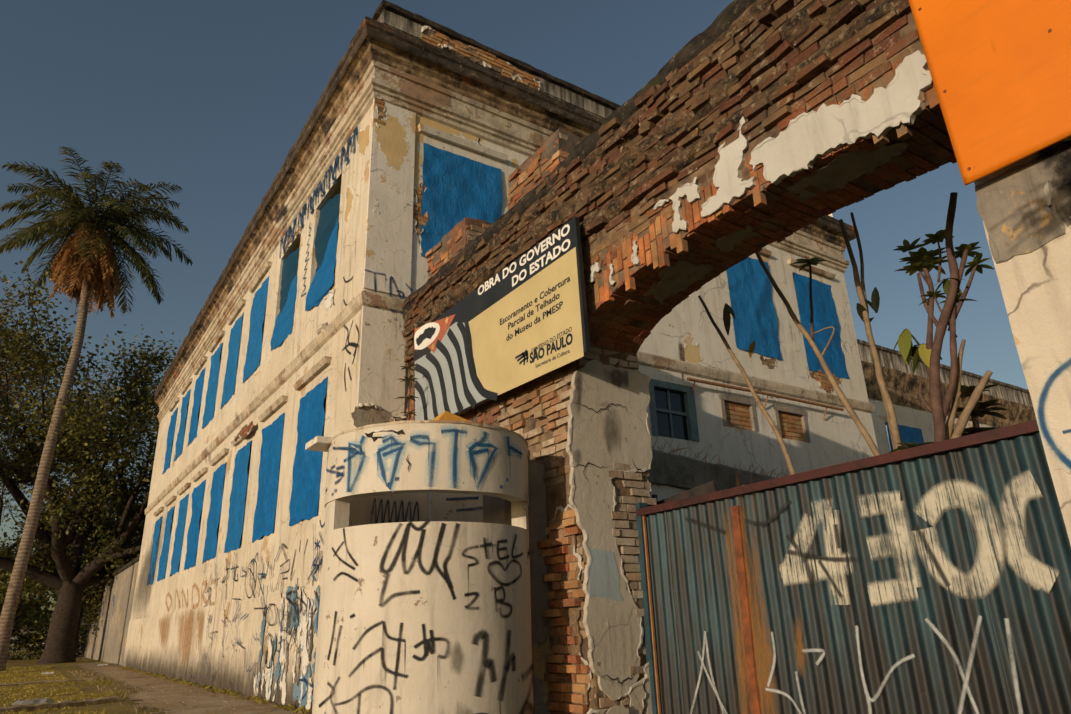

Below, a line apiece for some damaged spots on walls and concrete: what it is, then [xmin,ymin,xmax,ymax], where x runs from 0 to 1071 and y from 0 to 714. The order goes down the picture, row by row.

flaking render [421,26,542,90]
peeling [653,50,933,233]
peeling [358,97,483,254]
flaking render [351,403,407,442]
crack [568,462,645,497]
flaking render [537,473,594,714]
damp [126,659,299,707]